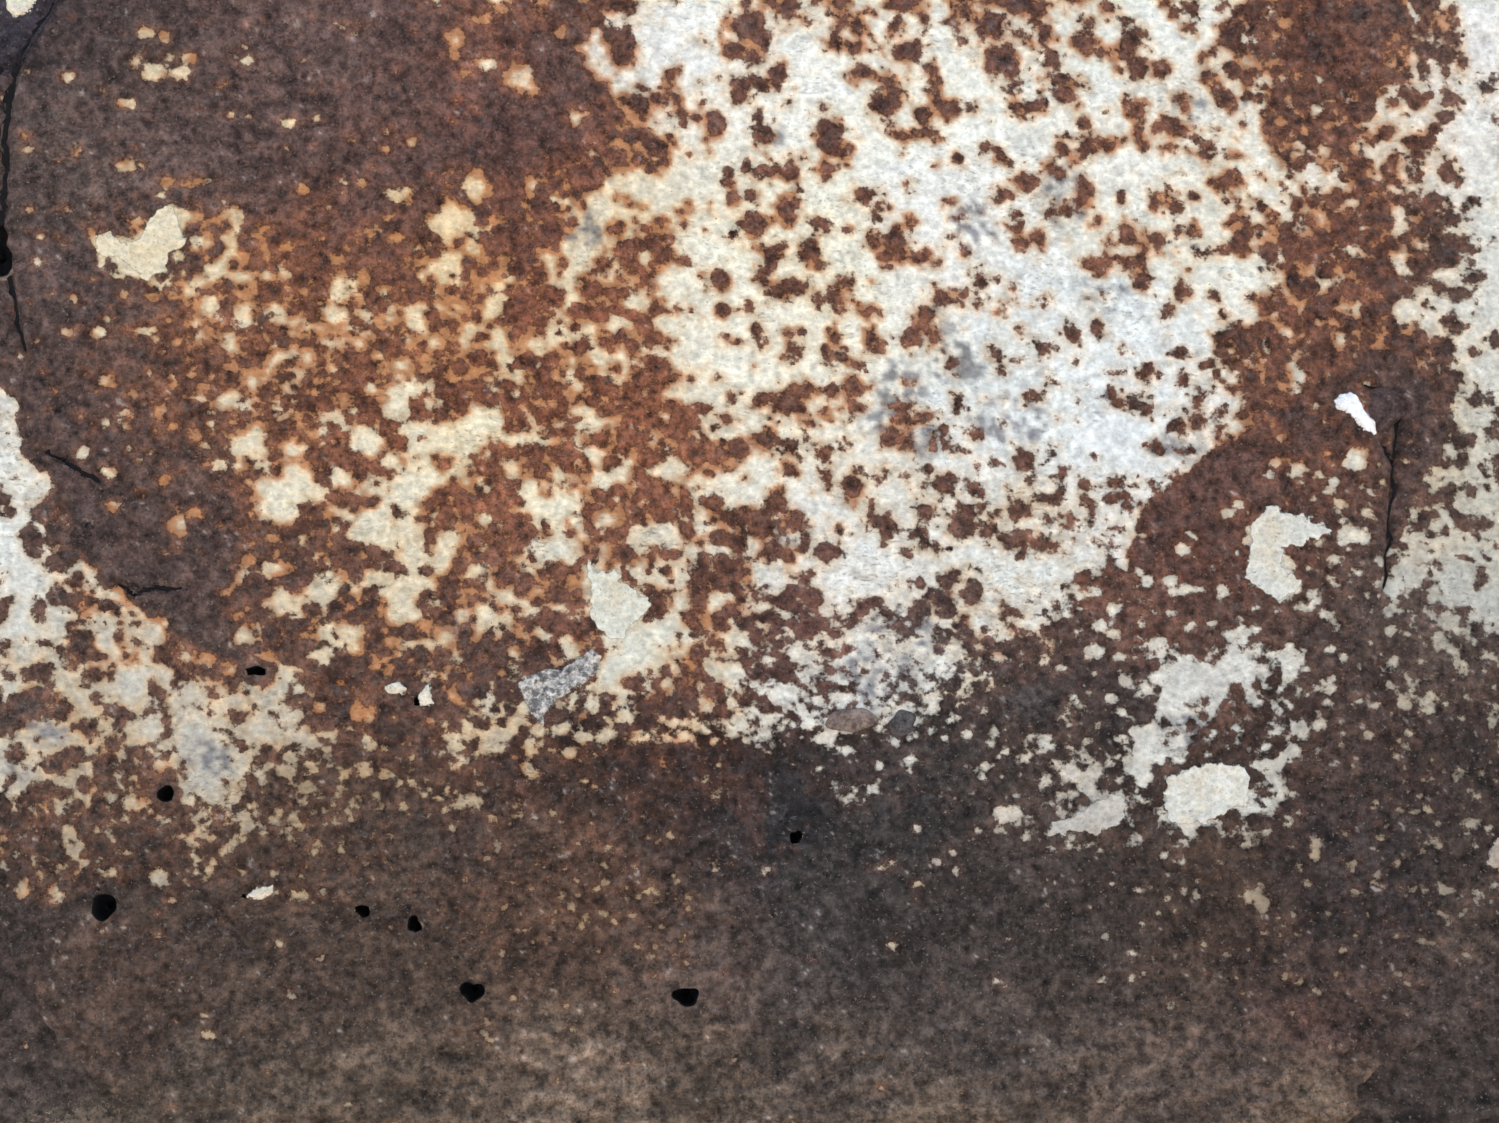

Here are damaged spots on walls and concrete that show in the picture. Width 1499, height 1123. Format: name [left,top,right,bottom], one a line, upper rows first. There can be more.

crack [7,275,26,351]
crack [0,0,55,226]
rust [560,217,692,361]
rust [719,153,883,319]
rust [718,0,978,153]
rust [942,0,1085,121]
rust [978,92,1238,253]
rust [1078,188,1202,290]
rust [752,327,873,501]
rust [861,441,1072,561]
crack [1380,420,1400,589]
rust [0,662,74,770]